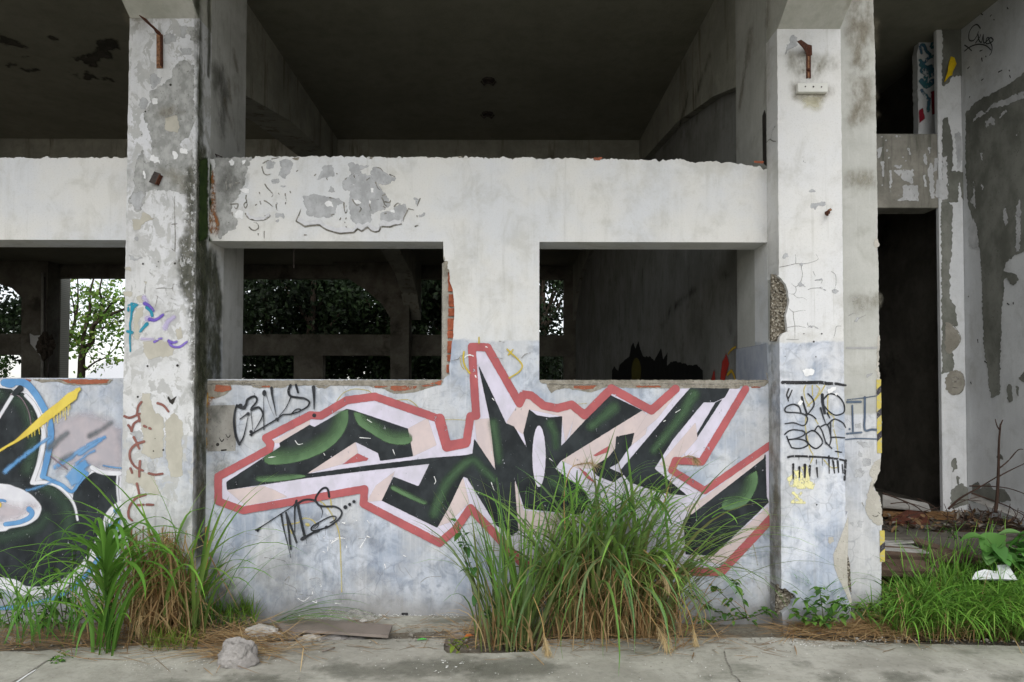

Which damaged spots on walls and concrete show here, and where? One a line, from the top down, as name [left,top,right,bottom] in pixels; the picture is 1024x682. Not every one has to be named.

peeling [941,30,970,86]
peeling [128,25,197,241]
water stain [173,0,252,558]
spalling [207,251,454,398]
peeling [243,157,425,238]
spalling [770,274,787,342]
crack [782,254,863,340]
peeling [877,70,1024,402]
peeling [126,393,183,495]
spalling [828,441,883,611]